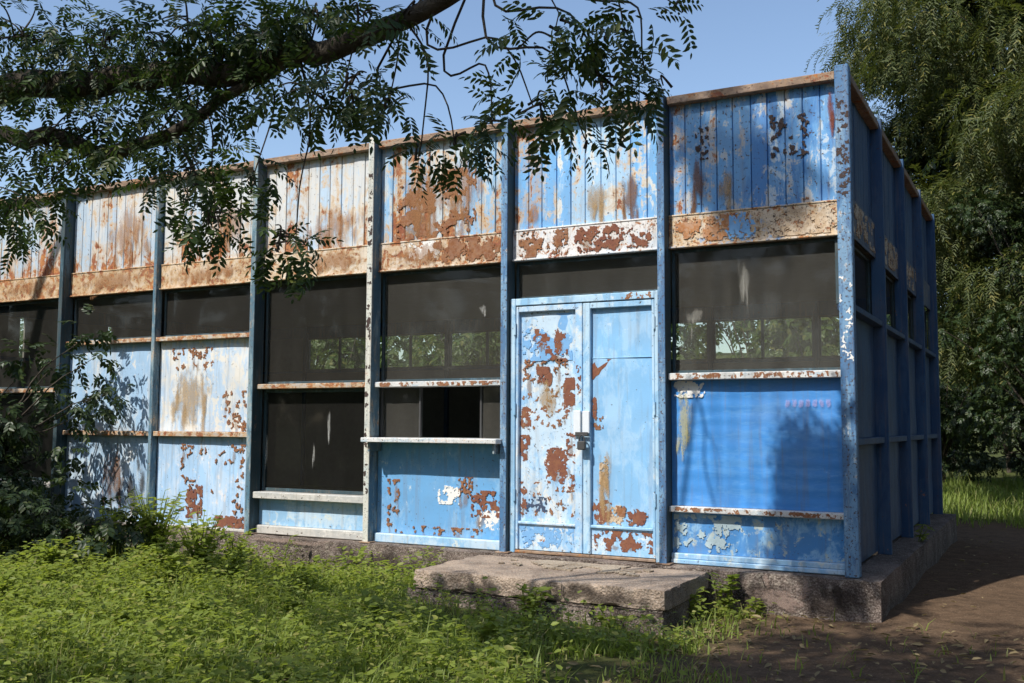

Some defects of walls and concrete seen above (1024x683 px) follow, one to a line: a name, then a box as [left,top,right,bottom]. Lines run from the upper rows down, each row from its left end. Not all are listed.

peeling [835,98,916,291]
peeling [839,276,854,361]
rust [172,377,206,432]
peeling [498,313,654,576]
water stain [676,397,690,459]
peeling [386,477,500,538]
rust [599,461,610,526]
peeling [674,507,749,553]
peeling [764,511,841,519]